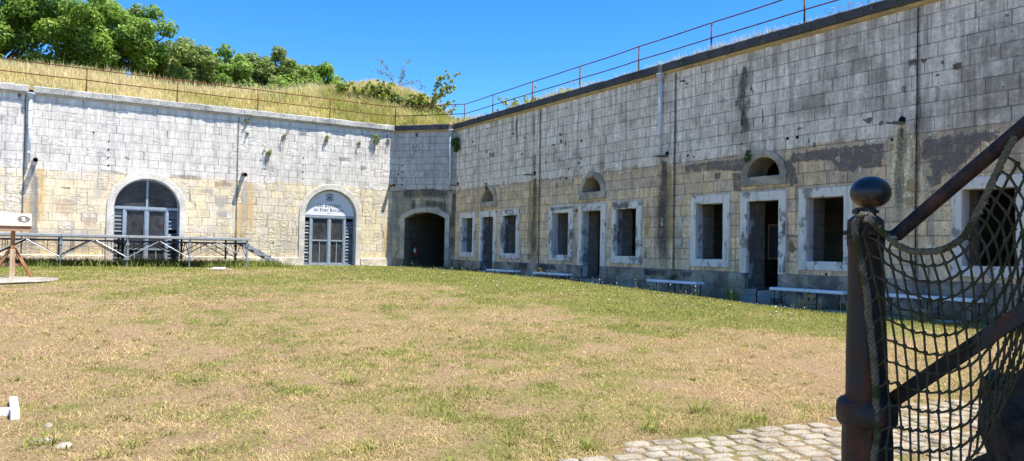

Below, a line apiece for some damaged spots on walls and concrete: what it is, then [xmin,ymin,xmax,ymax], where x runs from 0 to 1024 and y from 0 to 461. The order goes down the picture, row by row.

damp [735,67,748,128]
damp [890,129,930,218]